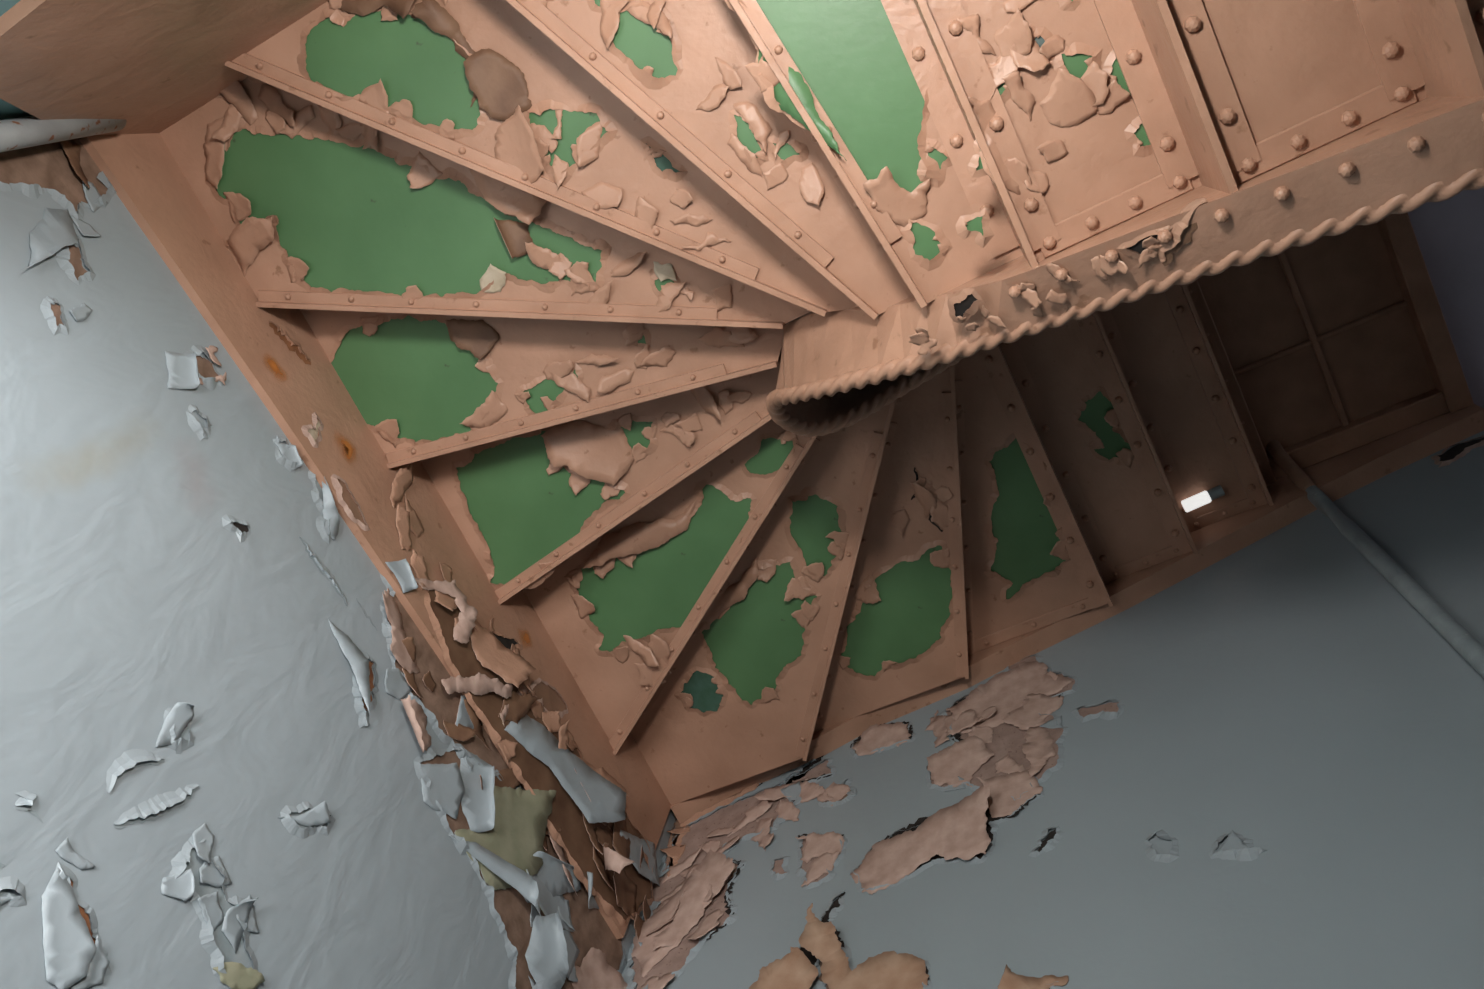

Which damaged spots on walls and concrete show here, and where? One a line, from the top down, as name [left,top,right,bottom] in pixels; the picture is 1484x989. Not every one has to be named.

peeling [0,137,117,335]
peeling [165,345,227,441]
peeling [203,0,1174,989]
peeling [155,702,195,754]
peeling [0,837,112,989]
peeling [161,823,265,989]